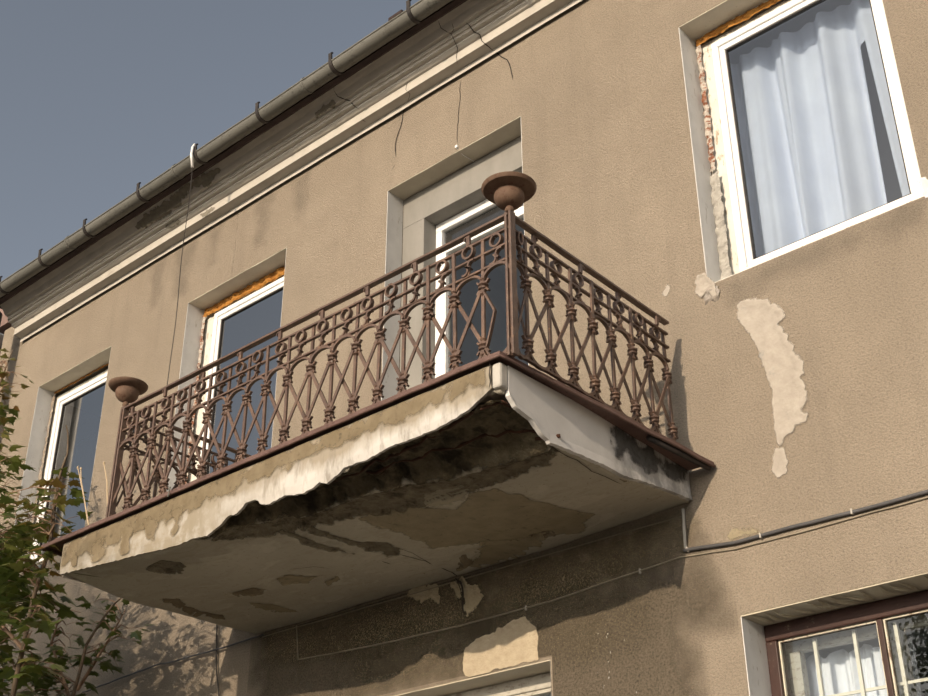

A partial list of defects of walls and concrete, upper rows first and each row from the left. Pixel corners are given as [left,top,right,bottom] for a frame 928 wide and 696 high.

crack [438,21,513,79]
flaking render [695,45,715,172]
peeling [135,168,220,229]
peeling [918,177,928,198]
flaking render [695,273,720,305]
flaking render [187,316,206,462]
peeling [772,447,788,478]
spalling [199,400,595,617]
spalling [160,598,225,619]
flaking render [463,616,539,677]